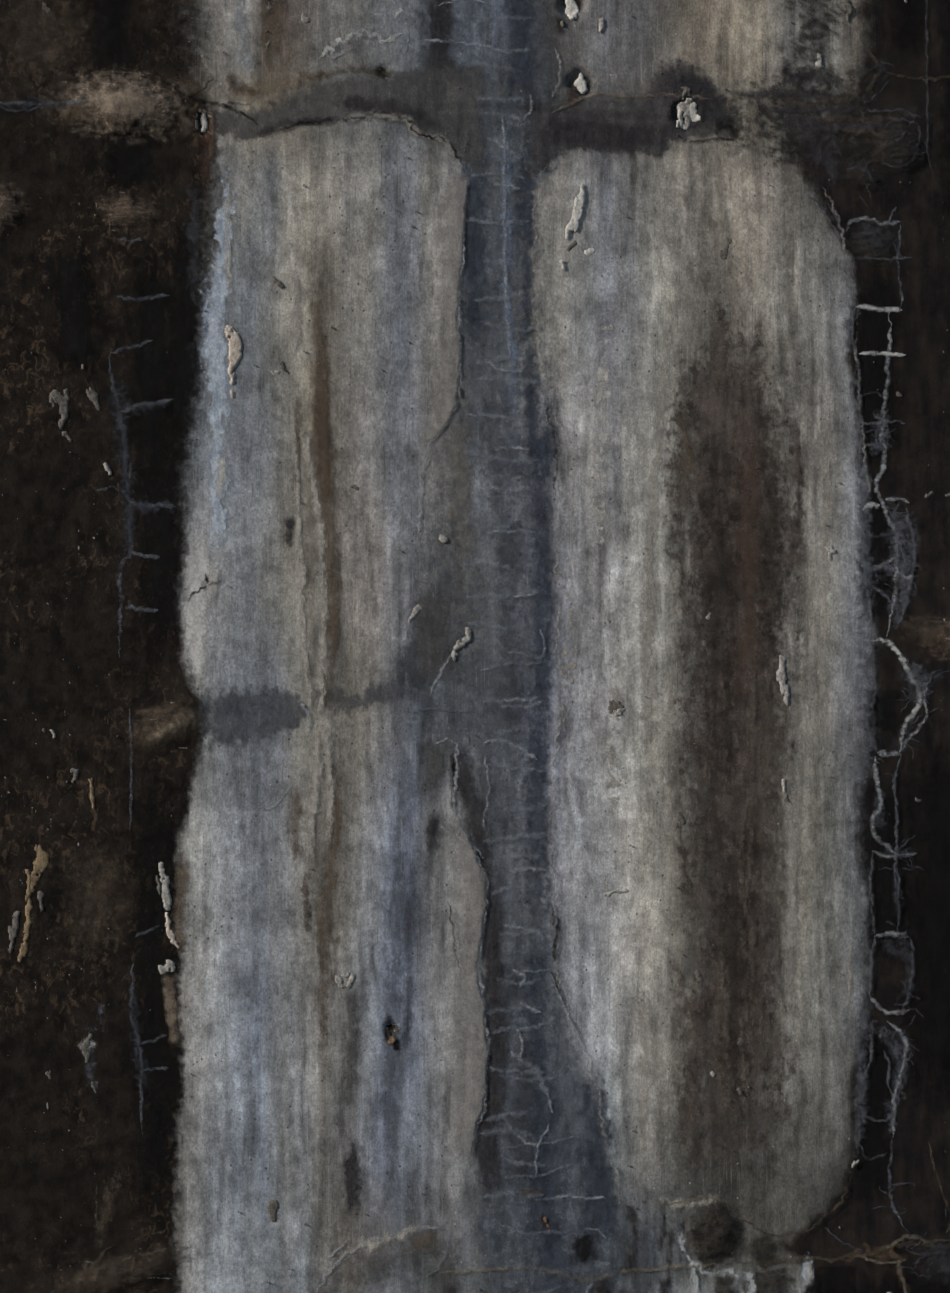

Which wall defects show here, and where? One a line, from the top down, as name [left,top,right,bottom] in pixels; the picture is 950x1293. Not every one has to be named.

peeling [225,325,242,399]
peeling [568,73,591,107]
crack [487,54,708,372]
peeling [671,87,702,130]
crack [805,1,950,260]
flaking render [8,845,49,962]
peeling [156,862,189,1042]
leakage [0,0,740,1293]
leakage [450,487,794,1293]
crack [316,293,950,1293]
leakage [641,276,833,1157]
leakage [741,0,950,1293]